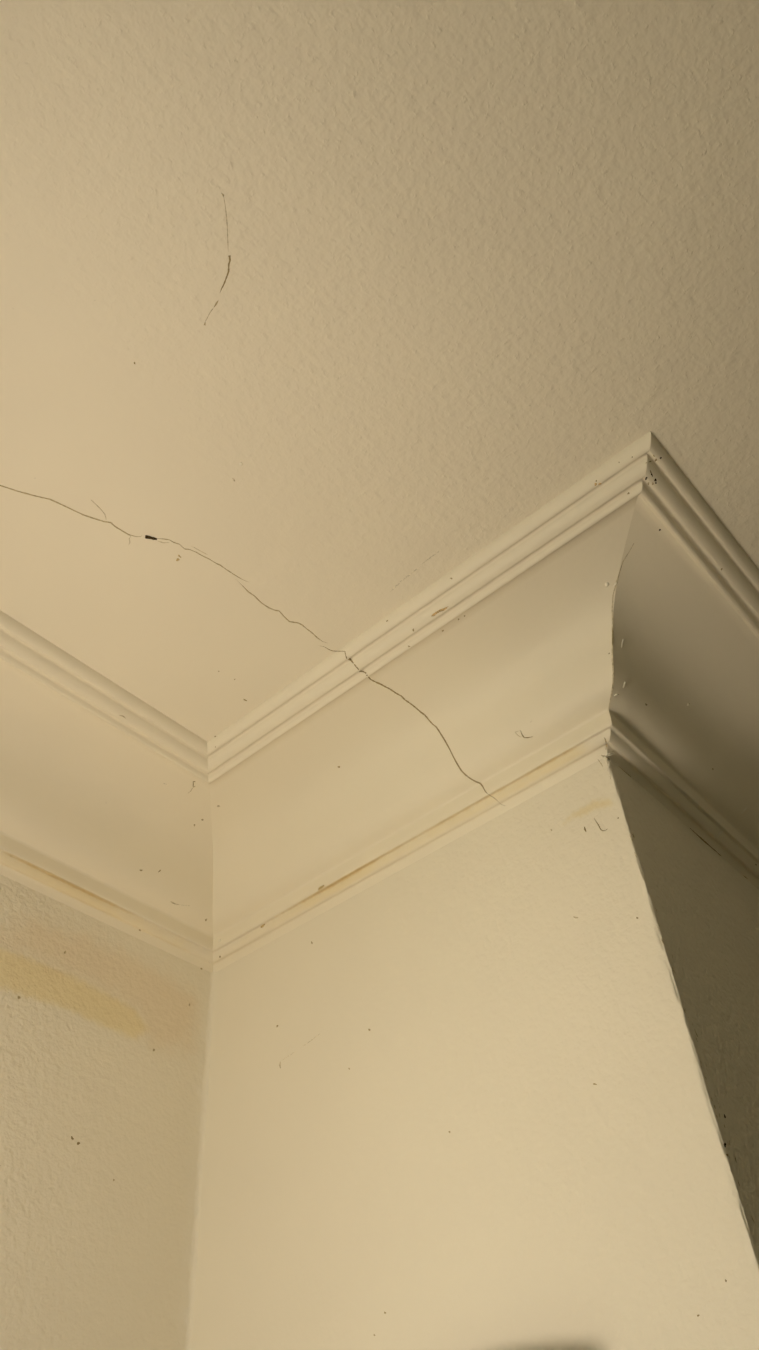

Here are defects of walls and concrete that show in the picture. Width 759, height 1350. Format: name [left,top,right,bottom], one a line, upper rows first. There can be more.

crack [204,193,231,326]
crack [0,485,505,806]